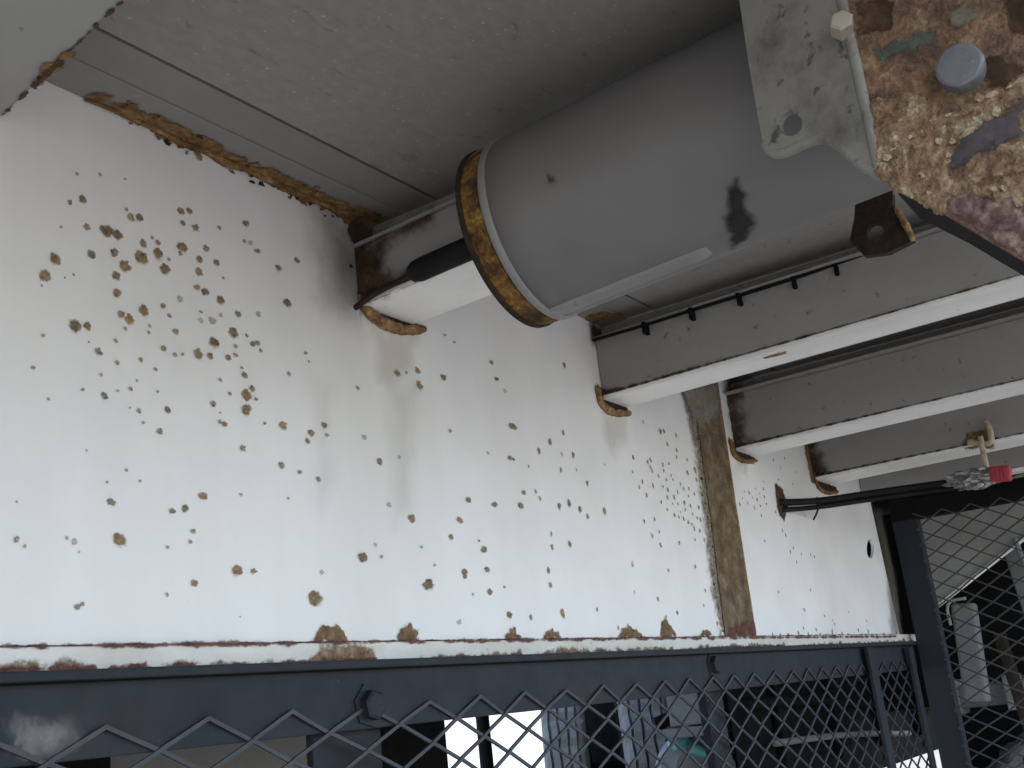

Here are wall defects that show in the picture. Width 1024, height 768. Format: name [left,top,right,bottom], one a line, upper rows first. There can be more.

corrosion [461,147,558,325]
water stain [726,181,755,245]
corrosion [847,0,1024,262]
corrosion [0,375,1023,672]